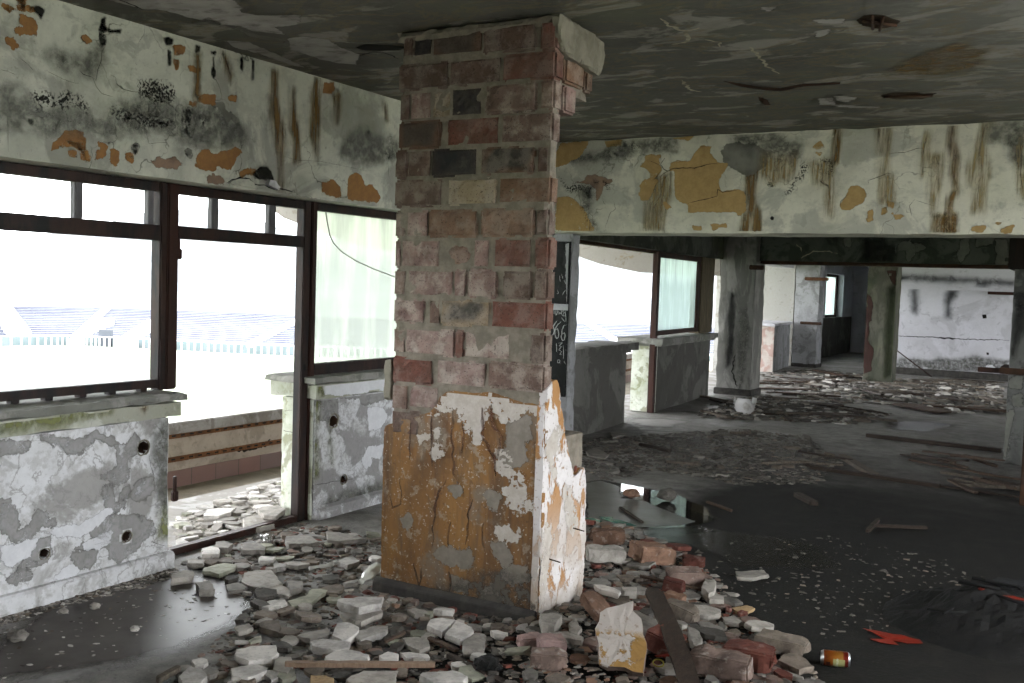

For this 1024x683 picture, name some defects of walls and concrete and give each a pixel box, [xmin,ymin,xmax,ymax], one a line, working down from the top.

peeling [1,0,38,51]
damp [0,79,245,144]
rust [271,70,320,187]
rust [724,81,840,105]
peeling [151,147,292,192]
peeling [322,173,381,203]
peeling [638,136,767,231]
damp [735,133,808,195]
damp [896,292,1024,371]
damp [153,426,168,508]
damp [327,481,402,509]
peeling [416,393,579,615]